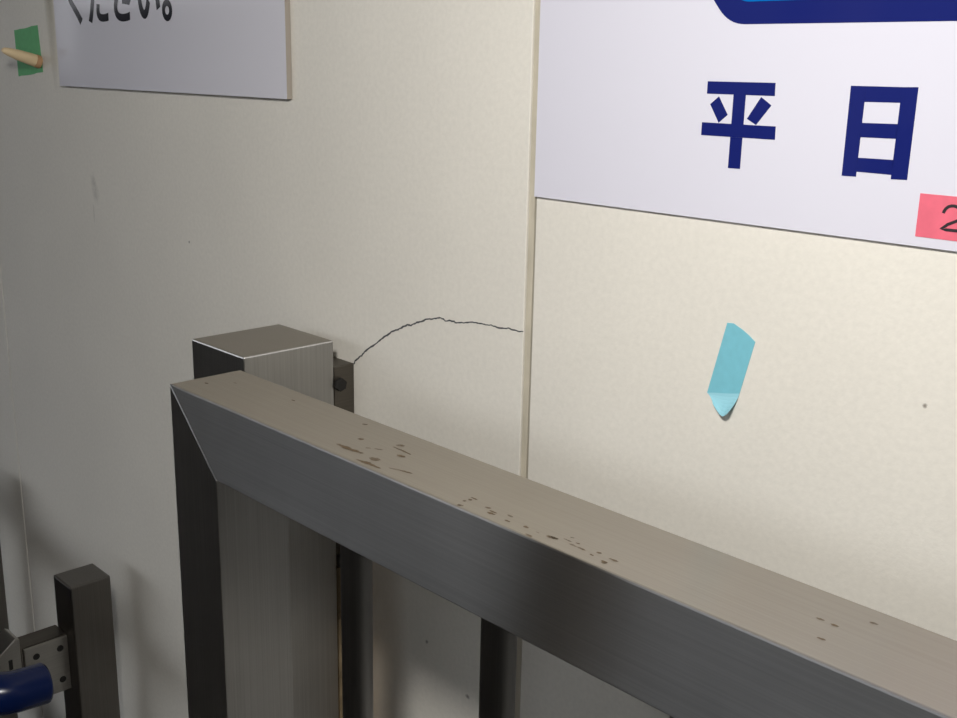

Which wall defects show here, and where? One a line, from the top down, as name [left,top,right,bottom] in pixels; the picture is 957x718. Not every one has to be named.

crack [354,317,523,364]